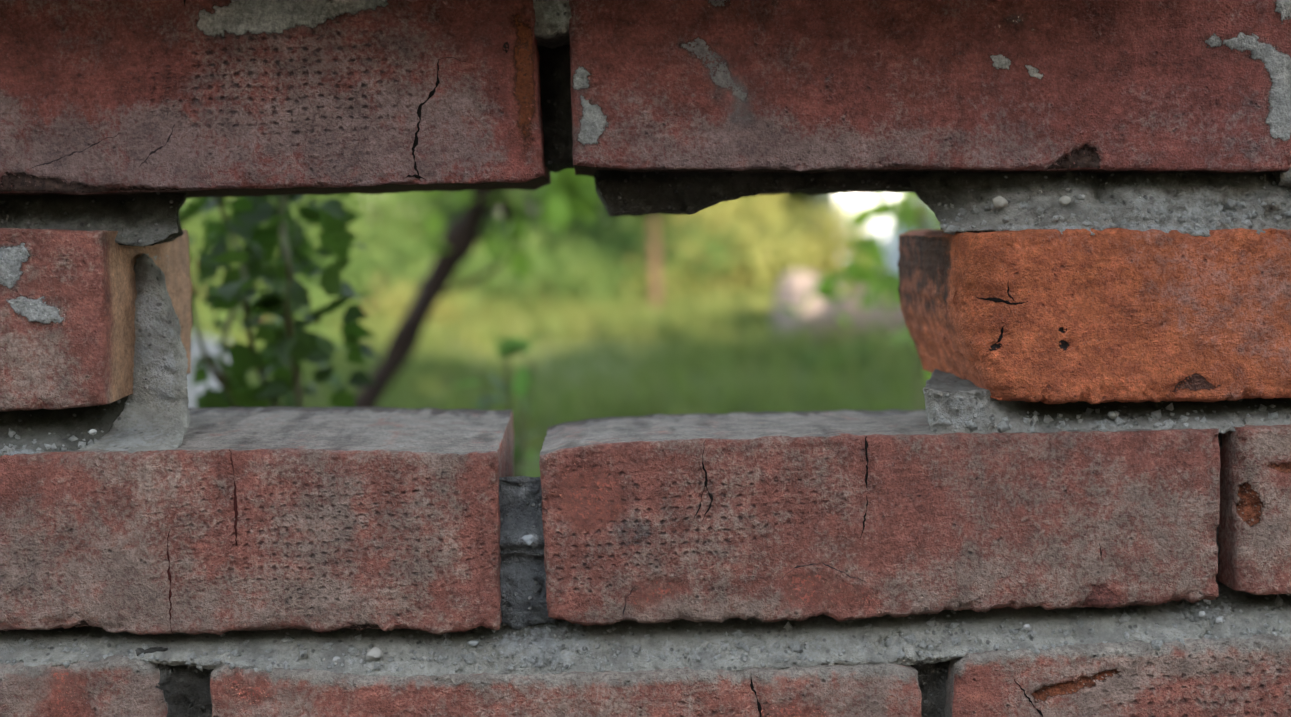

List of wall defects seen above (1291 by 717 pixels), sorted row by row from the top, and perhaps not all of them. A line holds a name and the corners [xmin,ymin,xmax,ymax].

crack [405,57,466,180]
crack [229,450,238,546]
crack [694,440,713,521]
crack [860,436,869,538]
spalling [1236,482,1264,527]
spalling [1267,462,1291,474]
crack [750,678,762,717]
spalling [1032,669,1120,703]